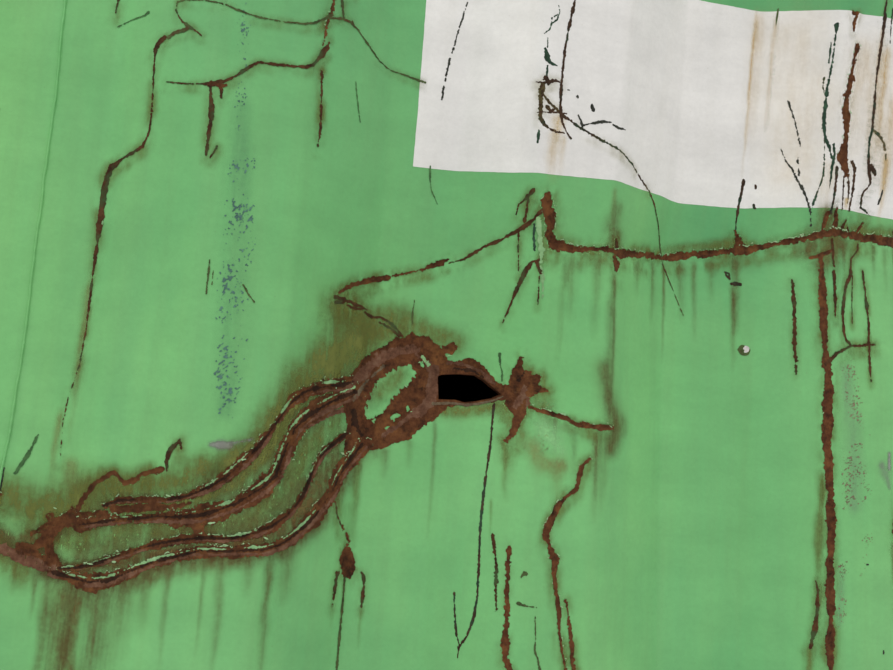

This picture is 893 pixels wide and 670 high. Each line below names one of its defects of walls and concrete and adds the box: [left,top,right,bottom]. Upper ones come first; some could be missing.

crack [60,0,468,456]
crack [334,0,893,382]
rust [0,293,460,523]
spalling [0,331,550,594]
crack [453,403,591,670]
crack [528,404,614,435]